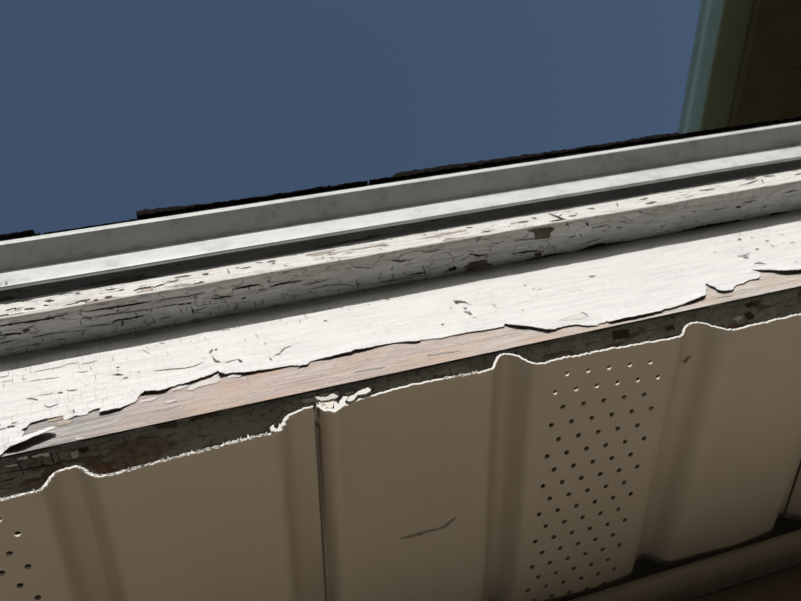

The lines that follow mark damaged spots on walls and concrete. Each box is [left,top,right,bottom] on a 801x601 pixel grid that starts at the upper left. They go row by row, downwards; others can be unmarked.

peeling [528,227,554,239]
crack [0,245,440,413]
peeling [0,248,801,467]
peeling [88,436,177,474]
peeling [25,479,46,489]